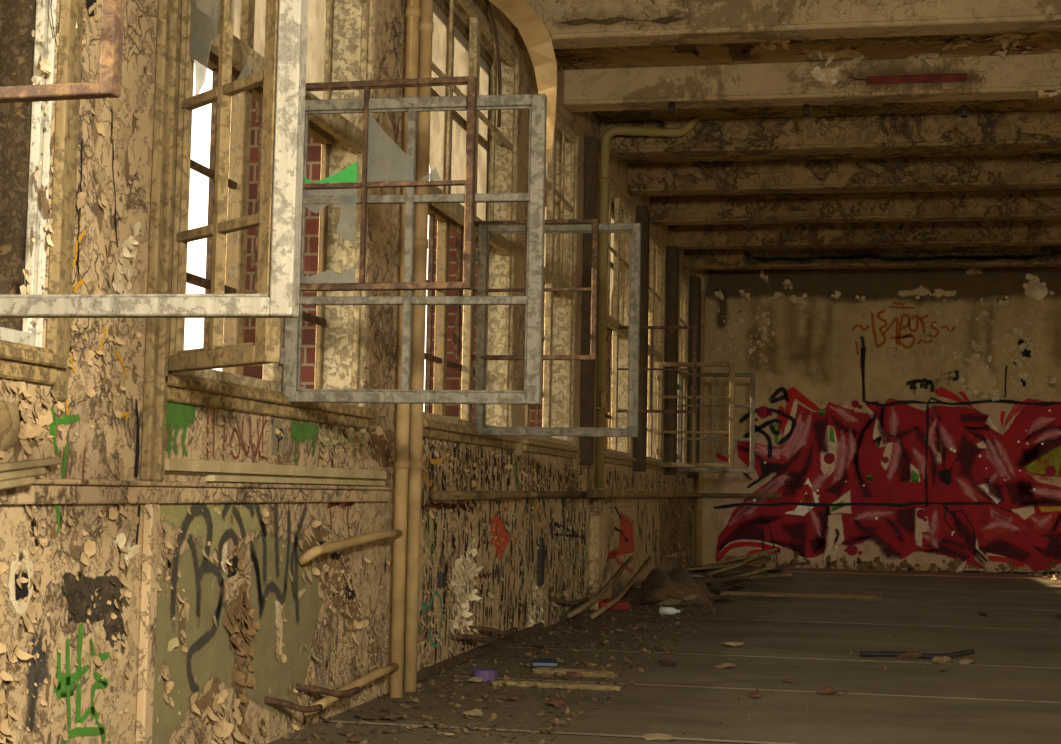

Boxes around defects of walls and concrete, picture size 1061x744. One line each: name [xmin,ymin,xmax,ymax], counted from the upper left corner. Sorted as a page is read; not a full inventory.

peeling [32,0,63,85]
peeling [20,102,55,294]
spalling [0,319,142,479]
peeling [191,407,291,462]
peeling [315,417,396,474]
peeling [0,496,393,744]